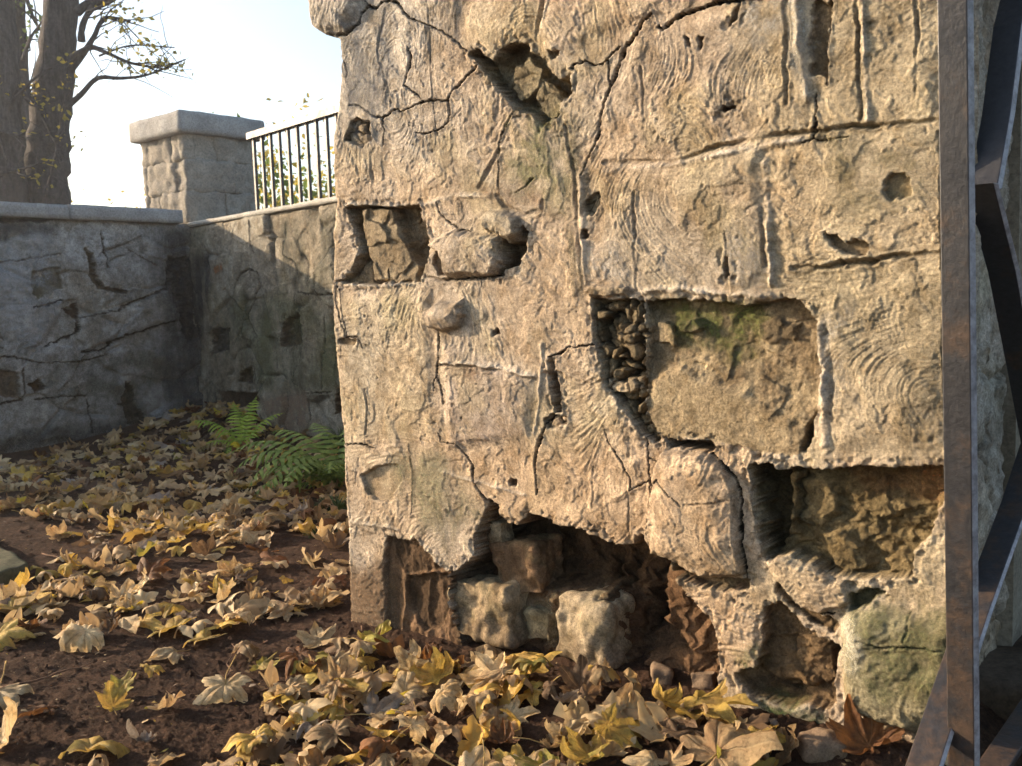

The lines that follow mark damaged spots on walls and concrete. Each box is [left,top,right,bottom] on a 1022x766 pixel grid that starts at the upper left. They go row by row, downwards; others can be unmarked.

crack [326,0,478,135]
spalling [470,41,573,121]
crack [570,0,756,175]
spalling [809,0,834,76]
crack [801,80,849,143]
spalling [341,204,444,284]
crack [0,230,178,429]
crack [552,342,598,357]
crack [601,424,681,534]
spalling [594,298,944,611]
spalling [385,505,751,681]
spalling [740,583,842,709]